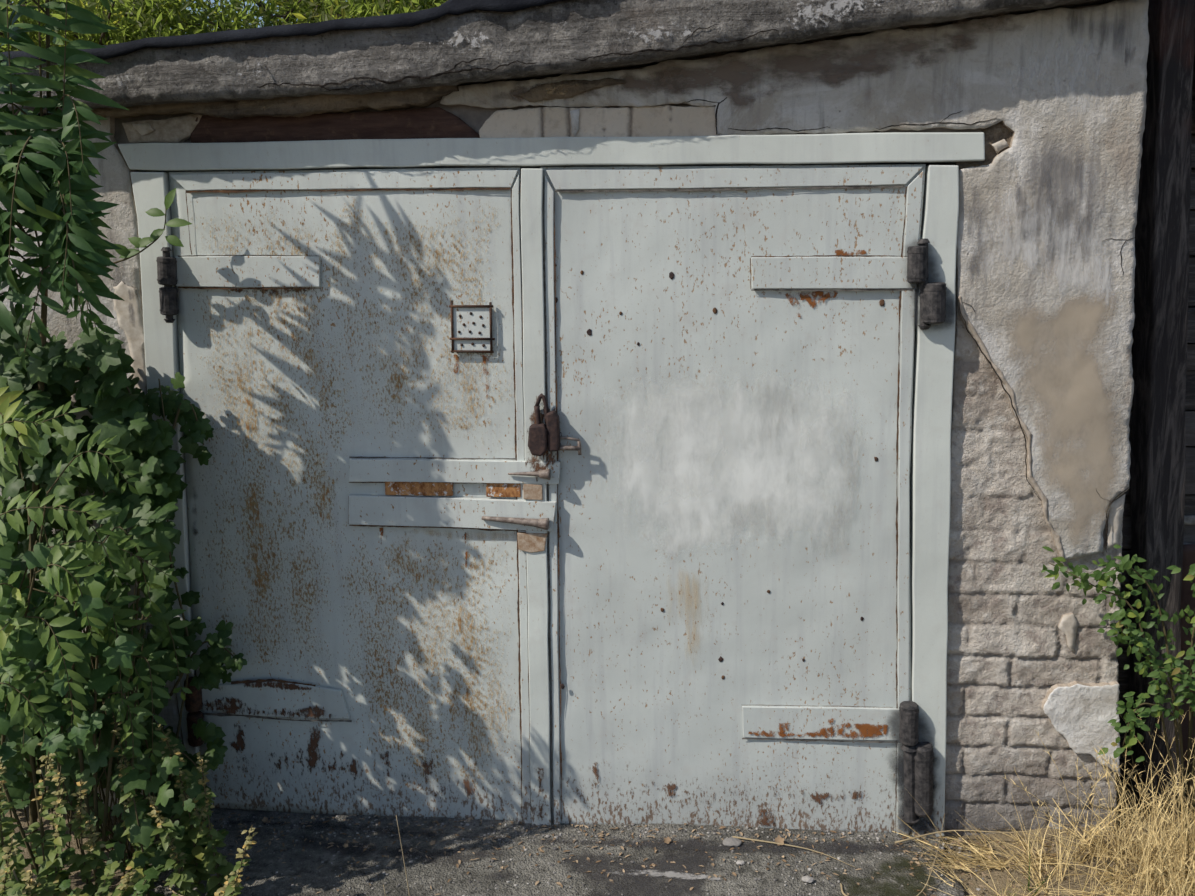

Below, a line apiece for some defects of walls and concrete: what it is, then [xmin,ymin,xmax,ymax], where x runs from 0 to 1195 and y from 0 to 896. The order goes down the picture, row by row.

crack [574,24,779,61]
crack [257,58,535,91]
corrosion [786,291,838,317]
leakage [1004,152,1115,535]
corrosion [198,201,510,665]
spalling [944,296,1125,836]
corrosion [202,528,511,797]
corrosion [748,718,888,738]
corrosion [770,786,863,805]
corrosion [758,810,774,827]